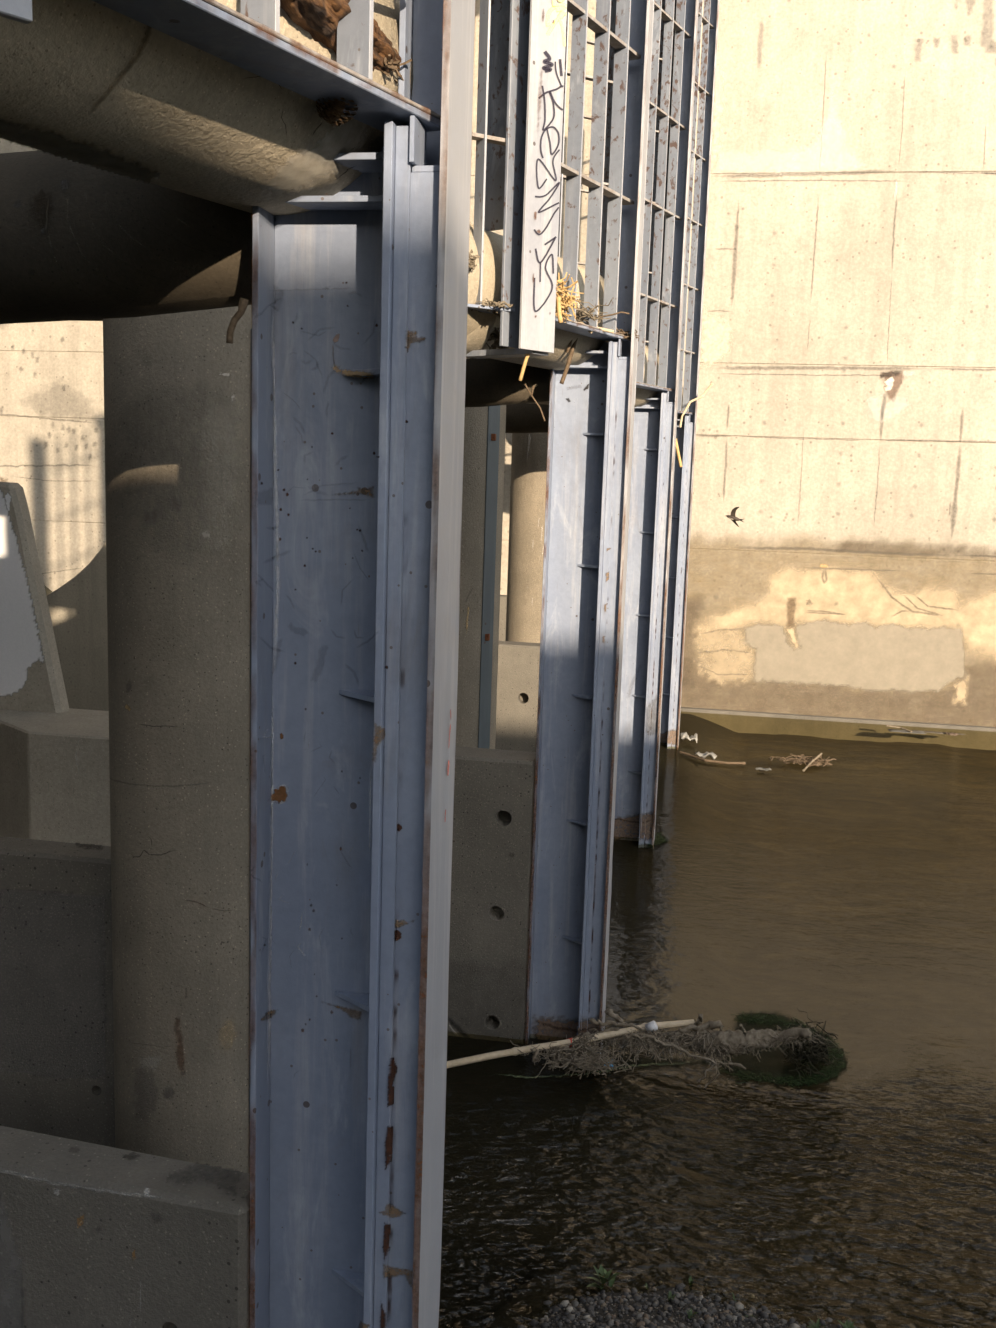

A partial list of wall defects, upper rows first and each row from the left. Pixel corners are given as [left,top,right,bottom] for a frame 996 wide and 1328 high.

water stain [681,544,996,727]
corrosion [525,542,689,1056]
corrosion [387,1058,397,1107]
corrosion [385,1126,393,1179]
corrosion [382,1222,392,1260]
corrosion [380,1276,391,1328]